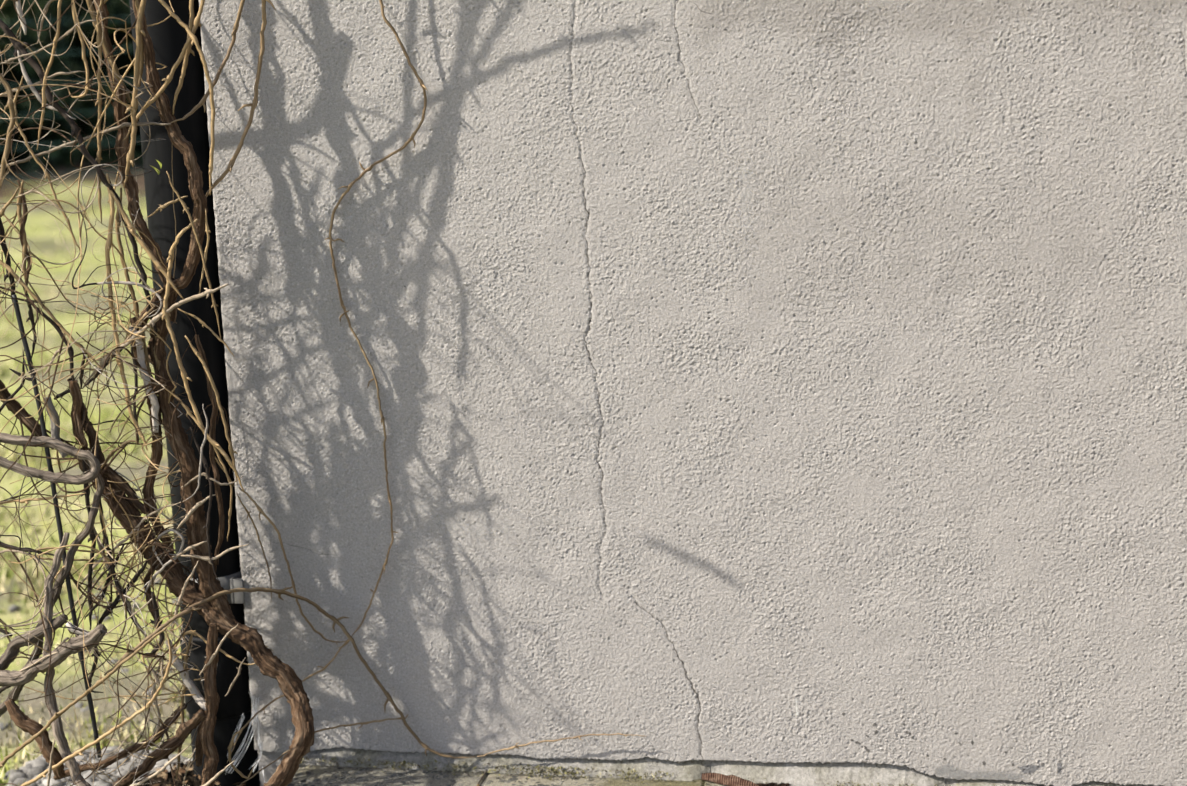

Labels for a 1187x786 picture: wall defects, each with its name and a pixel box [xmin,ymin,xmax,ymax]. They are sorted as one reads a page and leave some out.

crack [635,601,703,759]